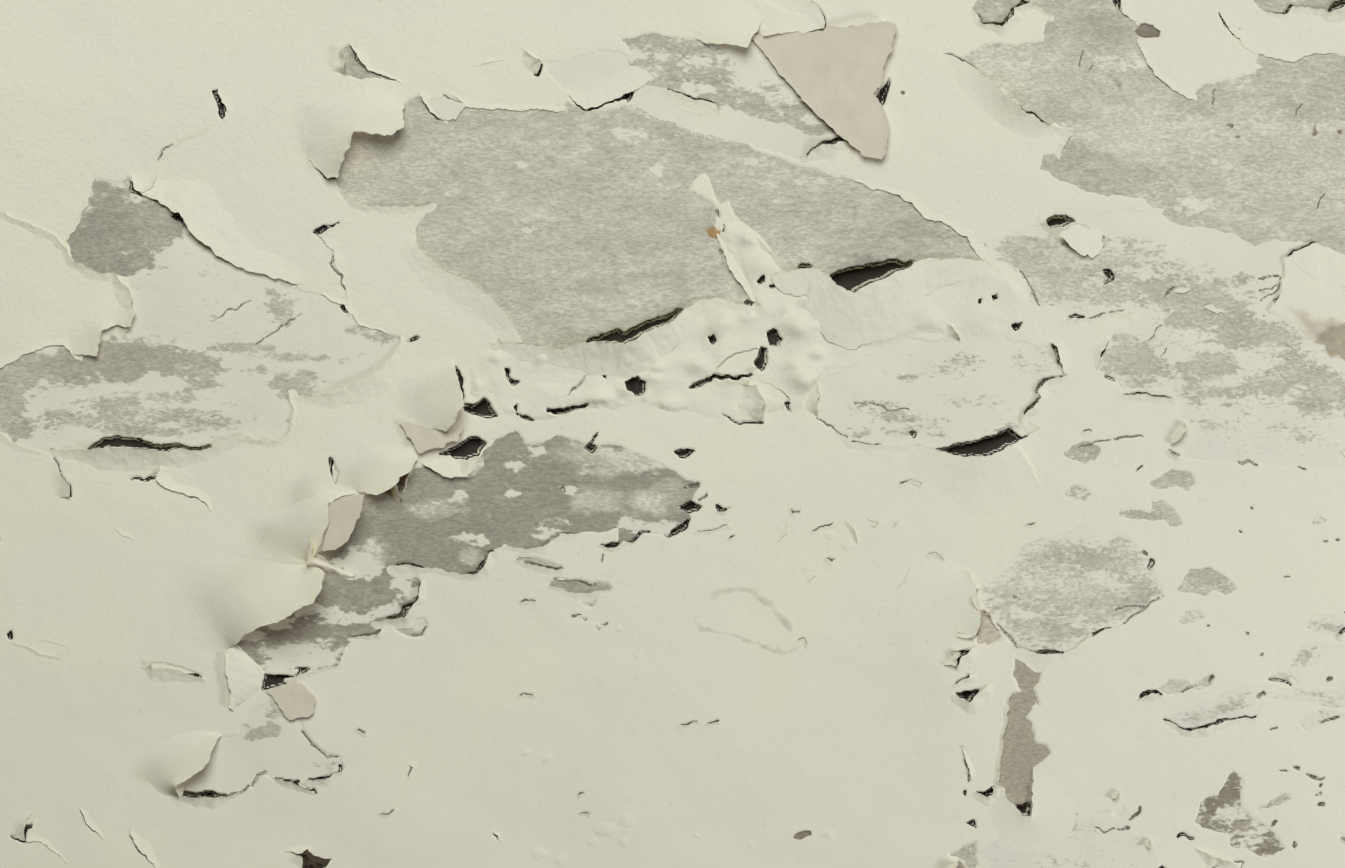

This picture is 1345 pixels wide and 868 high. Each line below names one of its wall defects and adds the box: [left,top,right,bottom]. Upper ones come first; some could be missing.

peeling [0,169,410,479]
peeling [177,0,1345,797]
peeling [943,526,1236,868]
peeling [1195,771,1297,858]
spalling [1280,766,1325,807]